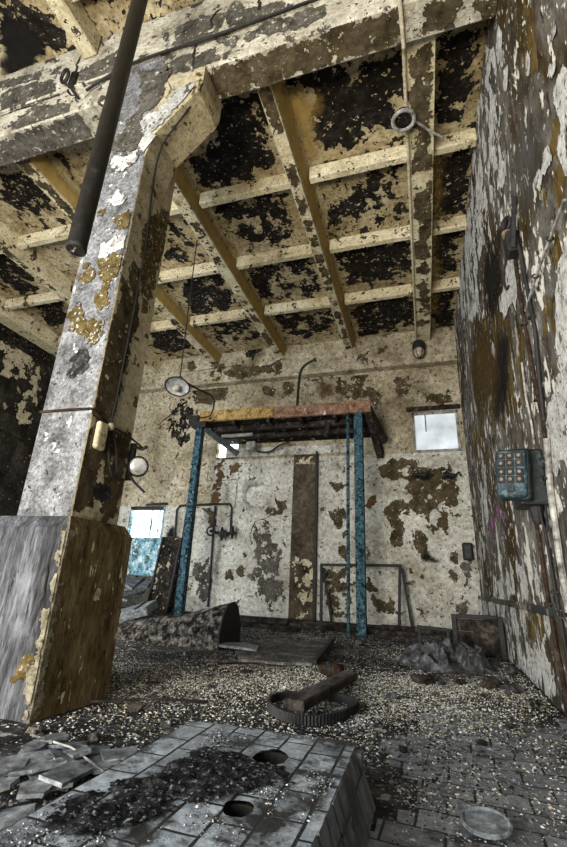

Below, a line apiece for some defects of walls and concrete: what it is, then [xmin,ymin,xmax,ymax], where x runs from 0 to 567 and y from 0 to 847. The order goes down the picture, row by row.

peeling [0,0,67,56]
peeling [0,69,93,220]
peeling [77,51,117,84]
peeling [522,0,538,76]
peeling [534,61,567,214]
peeling [0,189,295,520]
peeling [110,0,525,619]
water stain [495,335,509,419]
spalling [9,530,76,720]